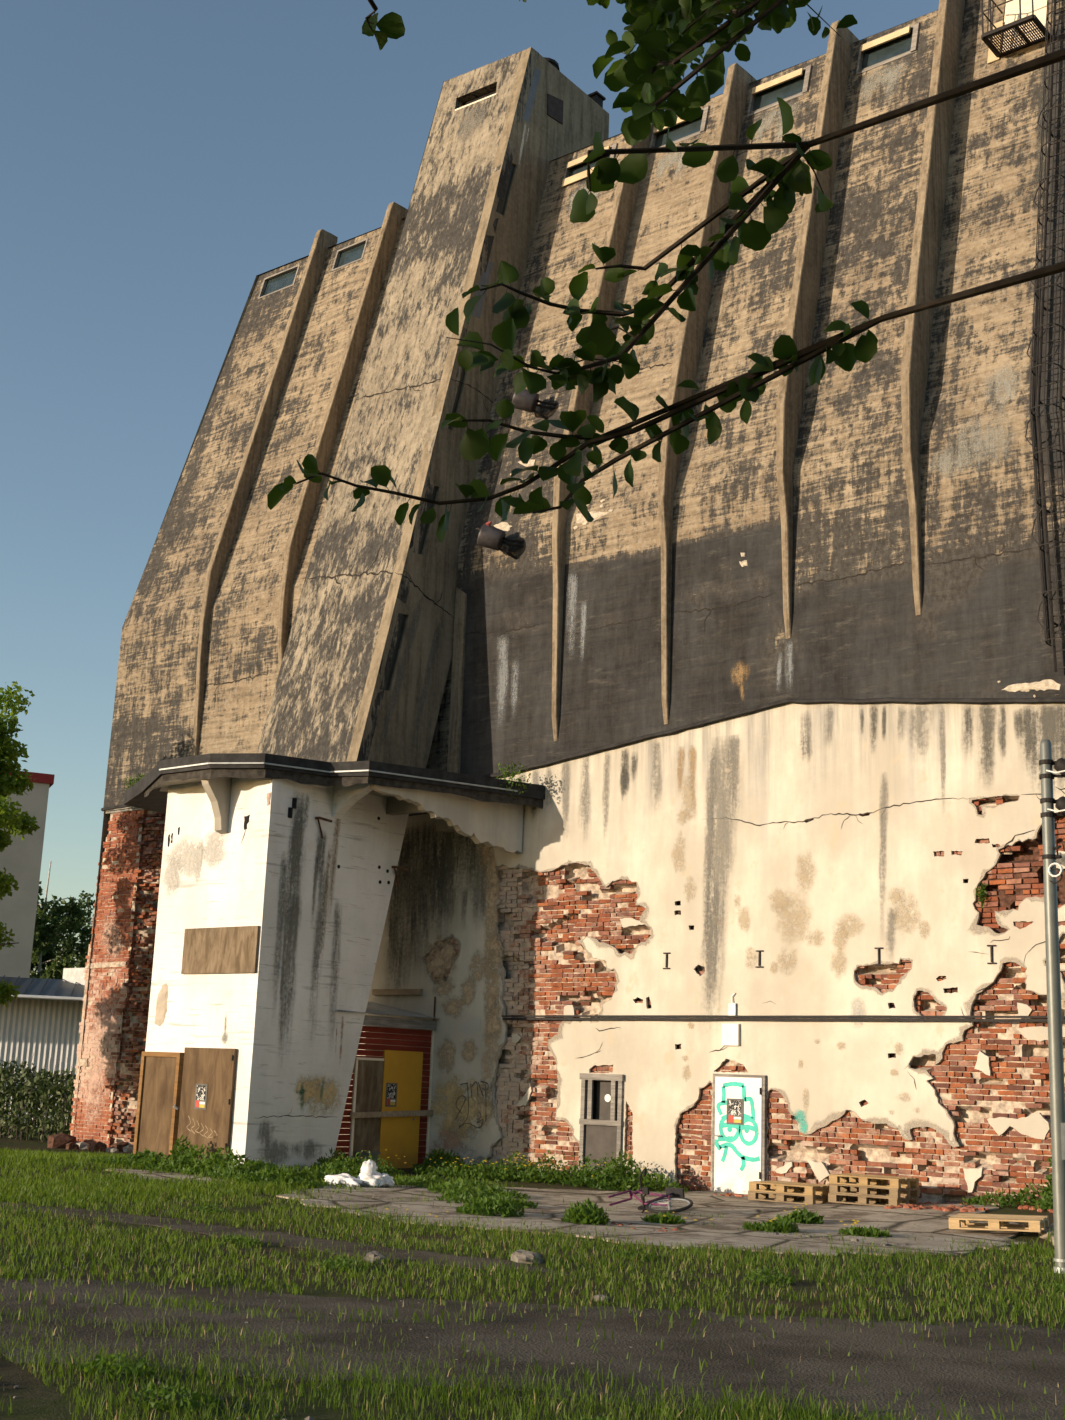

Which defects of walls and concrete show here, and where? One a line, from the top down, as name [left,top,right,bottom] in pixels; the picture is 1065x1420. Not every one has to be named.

water stain [569,576,586,649]
water stain [498,640,518,710]
water stain [965,705,1065,772]
water stain [518,751,636,819]
crack [712,798,970,829]
flaking render [969,795,1020,817]
crack [998,787,1065,853]
water stain [678,739,748,978]
water stain [275,802,339,1025]
flaking render [422,844,653,1172]
flaking render [766,812,1065,1207]
flaking render [674,1059,748,1191]